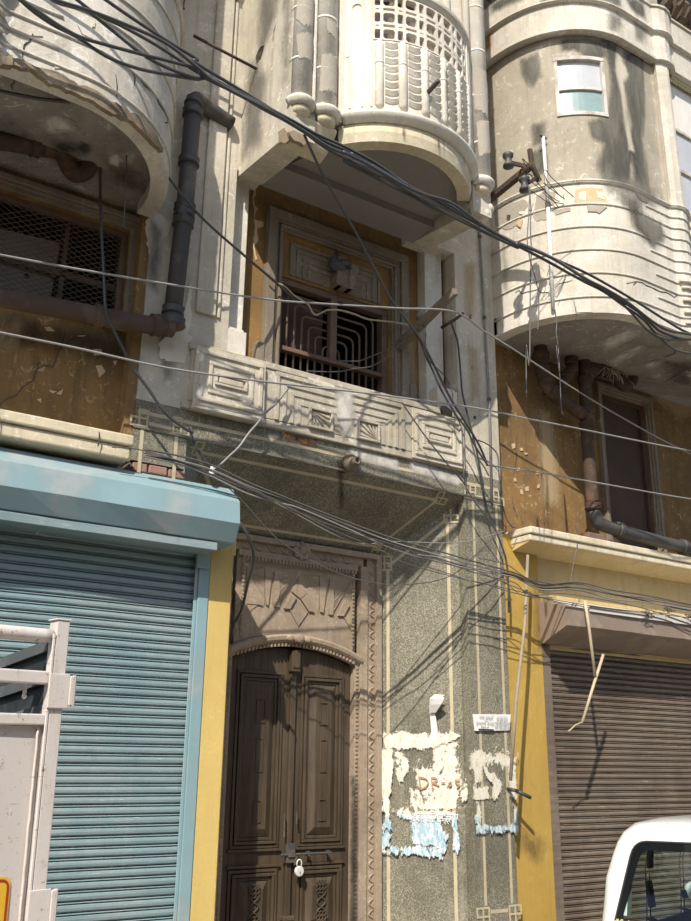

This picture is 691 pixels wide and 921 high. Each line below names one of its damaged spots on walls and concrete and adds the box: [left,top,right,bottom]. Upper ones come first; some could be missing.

damp [41,117,74,132]
spalling [0,51,164,153]
damp [562,39,665,243]
peeling [145,213,171,257]
peeling [158,283,192,364]
crack [0,324,67,406]